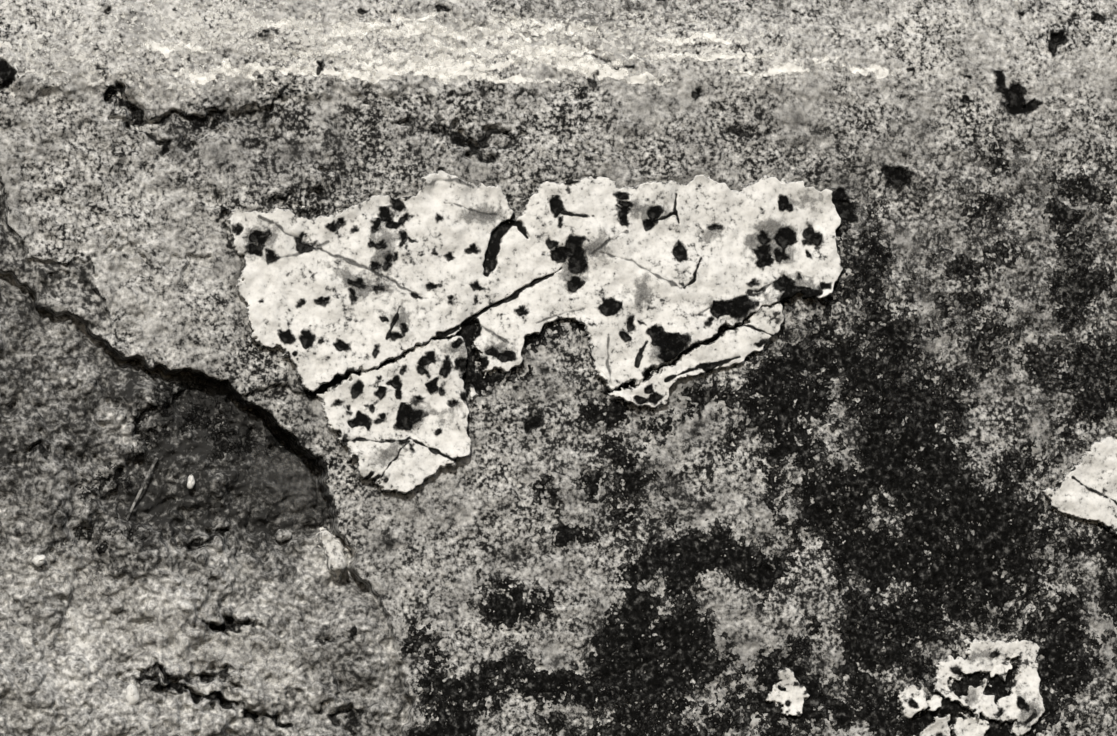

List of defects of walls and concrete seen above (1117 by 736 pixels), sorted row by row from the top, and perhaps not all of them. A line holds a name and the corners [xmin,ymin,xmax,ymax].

crack [237,44,647,405]
crack [592,193,702,289]
damp [831,197,903,323]
damp [924,131,1117,345]
damp [464,319,589,414]
peeling [227,170,857,495]
crack [602,284,791,395]
crack [340,437,456,482]
crack [201,616,263,636]
crack [123,662,365,736]
damp [401,612,454,728]
damp [566,684,758,736]